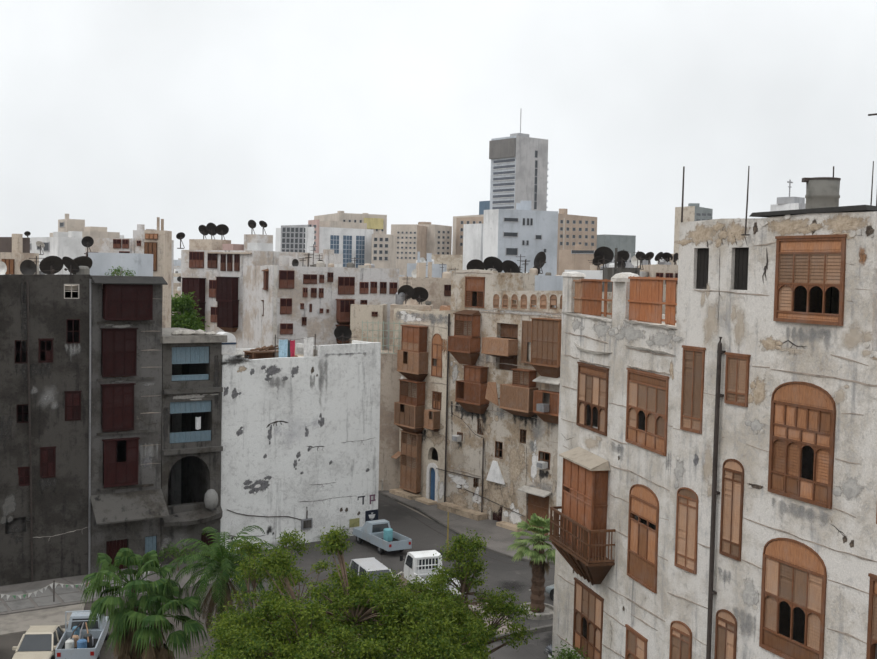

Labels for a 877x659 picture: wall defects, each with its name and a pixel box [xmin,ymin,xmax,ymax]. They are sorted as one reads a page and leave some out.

flaking render [679,214,874,248]
flaking render [758,336,783,351]
flaking render [221,355,299,381]
flaking render [243,476,272,494]